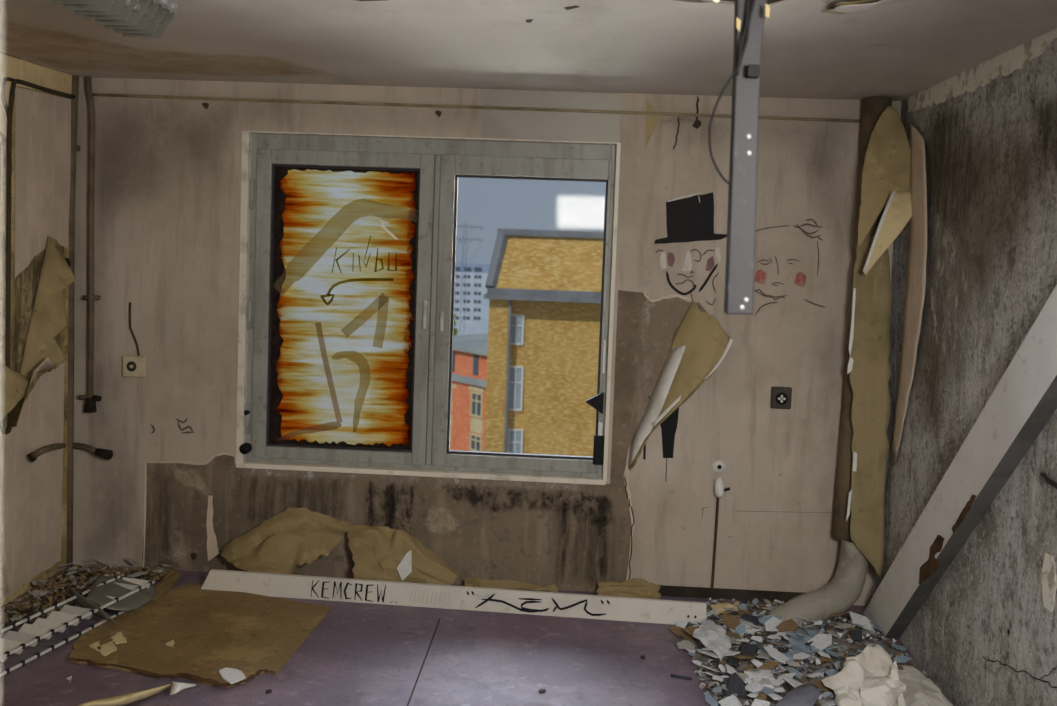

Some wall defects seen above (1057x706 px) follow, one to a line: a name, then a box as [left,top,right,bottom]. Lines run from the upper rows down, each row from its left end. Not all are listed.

damp [366,478,418,529]
damp [448,478,610,582]